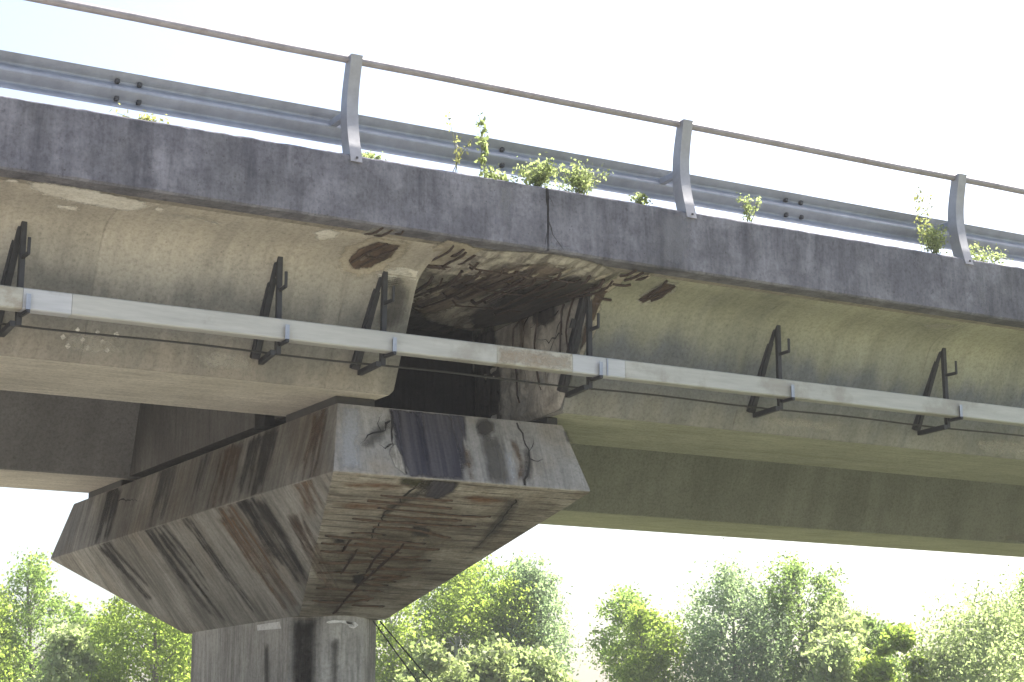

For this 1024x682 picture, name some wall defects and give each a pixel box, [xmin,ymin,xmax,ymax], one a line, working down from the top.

crack [545,188,564,250]
spalling [340,227,676,355]
water stain [95,490,150,598]
water stain [145,468,223,619]
water stain [184,519,252,610]
water stain [237,431,304,581]
crack [360,411,428,538]
water stain [389,409,466,499]
crack [472,423,543,551]
spalling [472,364,572,437]